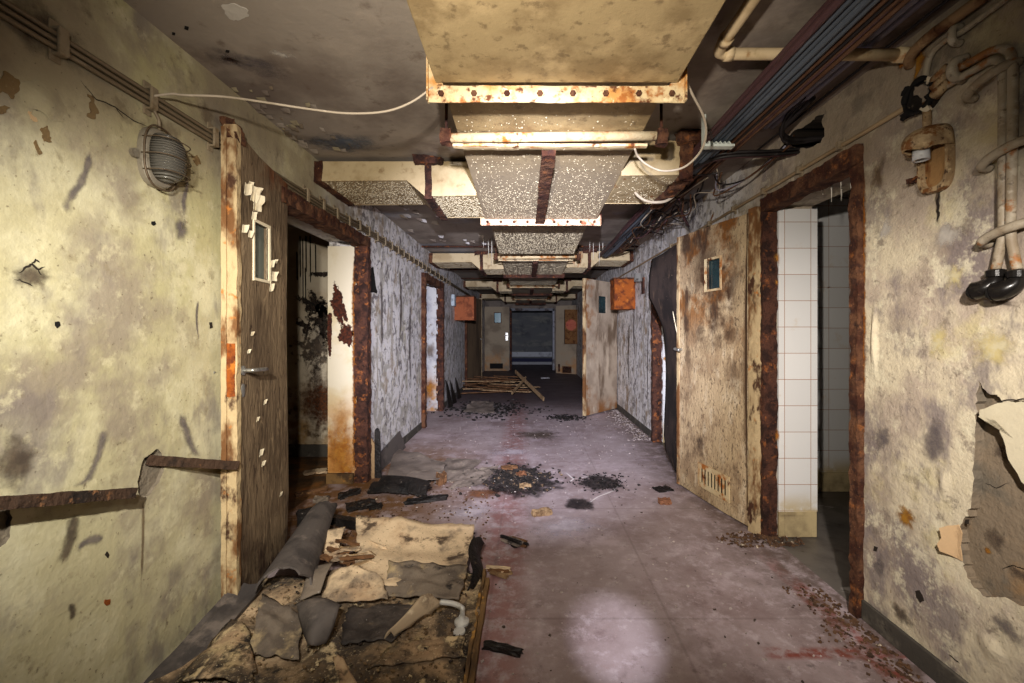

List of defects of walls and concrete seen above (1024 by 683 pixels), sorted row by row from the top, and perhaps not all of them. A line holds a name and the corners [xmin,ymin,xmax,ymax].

peeling [221,3,249,21]
peeling [0,71,21,114]
peeling [87,94,99,119]
water stain [65,156,91,208]
crack [14,259,46,286]
water stain [0,444,32,477]
spalling [138,449,164,498]
flaking render [937,382,1024,606]